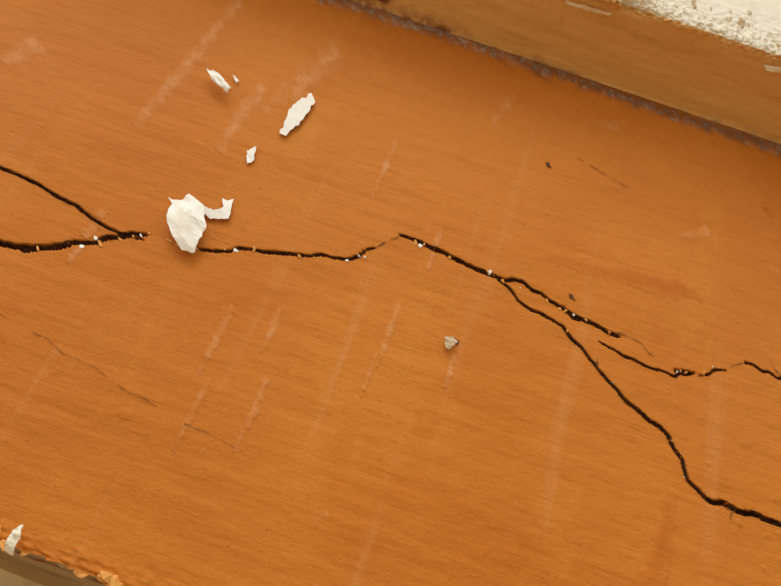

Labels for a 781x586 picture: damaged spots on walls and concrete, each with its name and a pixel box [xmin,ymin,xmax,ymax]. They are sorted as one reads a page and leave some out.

peeling [566,0,612,16]
peeling [206,68,239,93]
peeling [279,93,315,136]
peeling [246,146,256,164]
peeling [166,194,234,253]
crack [0,166,781,527]
spalling [445,336,459,349]